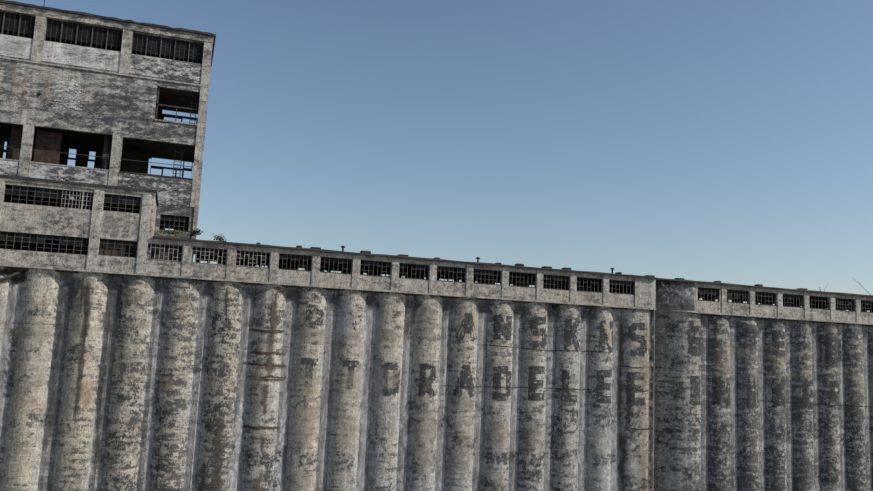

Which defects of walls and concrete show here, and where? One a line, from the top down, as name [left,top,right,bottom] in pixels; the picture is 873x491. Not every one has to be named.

spalling [0,268,28,284]
leakage [48,277,91,431]
leakage [94,276,127,483]
rust [242,351,286,381]